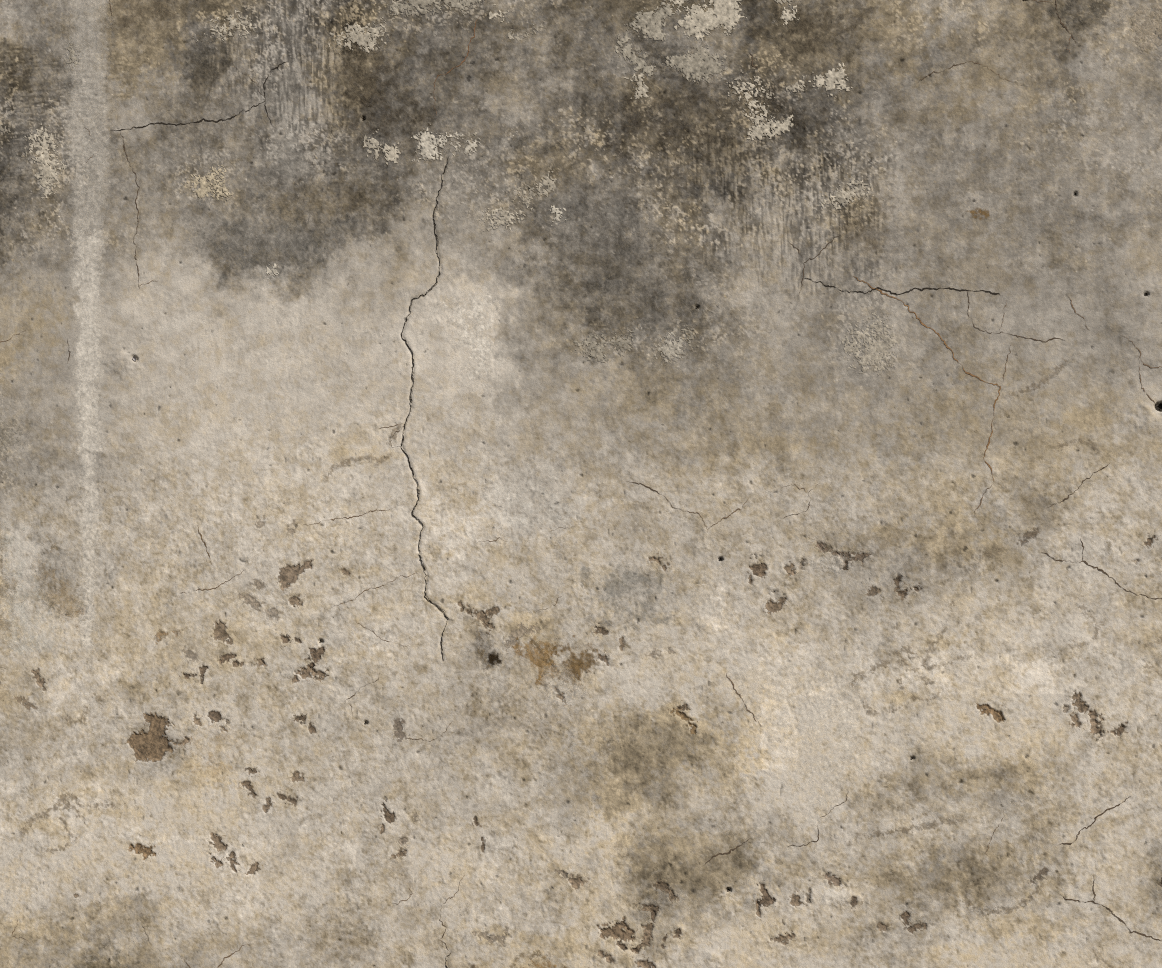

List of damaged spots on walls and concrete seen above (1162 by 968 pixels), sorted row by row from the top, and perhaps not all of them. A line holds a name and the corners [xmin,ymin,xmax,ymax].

leakage [635,35,676,64]
leakage [788,0,874,52]
crack [86,62,285,286]
leakage [443,294,494,386]
crack [789,236,1088,509]
crack [310,158,448,661]
flaking render [239,559,314,620]
crack [1042,535,1162,600]
flaking render [281,634,329,683]
flaking render [127,710,230,762]
flaking render [209,832,259,875]
flaking render [597,879,682,968]